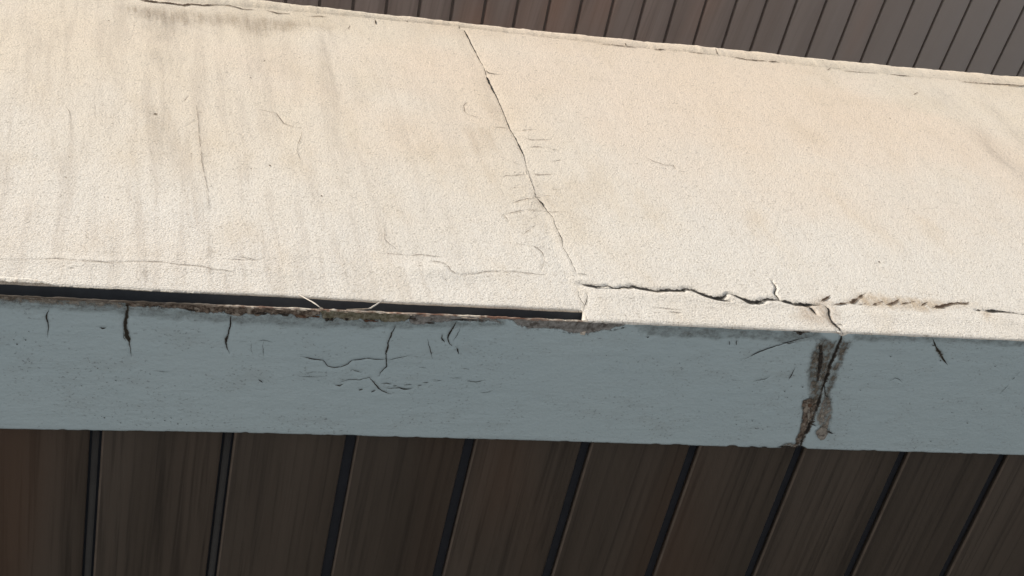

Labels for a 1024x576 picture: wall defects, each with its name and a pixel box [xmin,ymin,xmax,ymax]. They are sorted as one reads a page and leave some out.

crack [384,31,1024,381]
crack [123,304,131,352]
crack [225,316,270,356]
spalling [1,297,625,334]
crack [305,321,460,376]